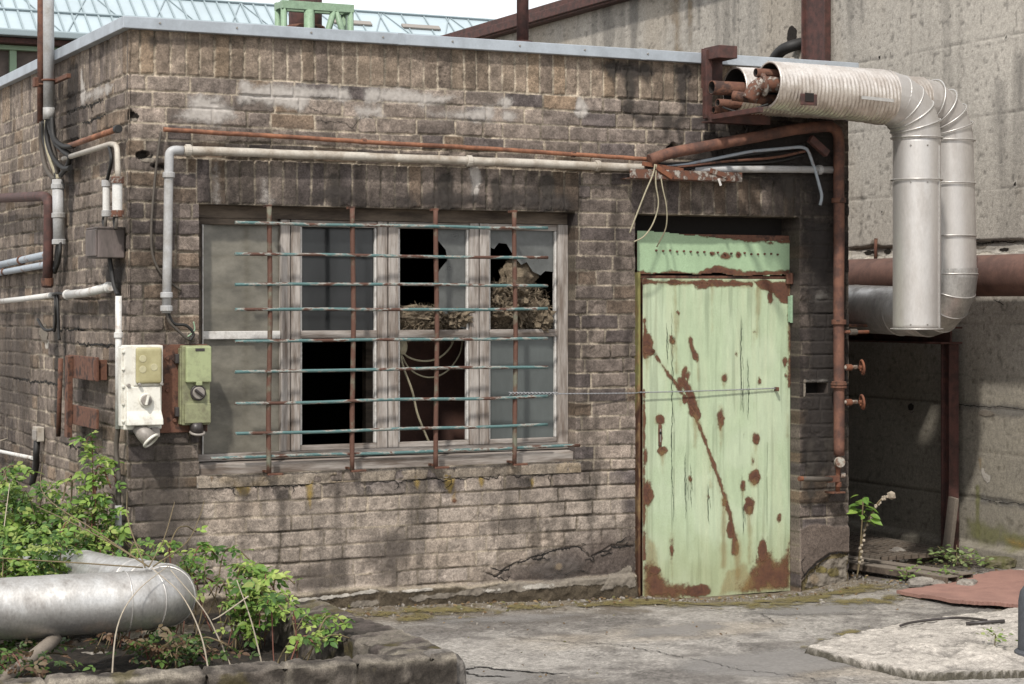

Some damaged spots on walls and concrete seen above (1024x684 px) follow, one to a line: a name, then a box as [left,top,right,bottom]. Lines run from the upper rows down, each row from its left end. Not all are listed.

rust [783,322,791,387]
rust [643,319,760,555]
rust [643,389,711,598]
crack [487,537,634,581]
rust [742,540,790,592]